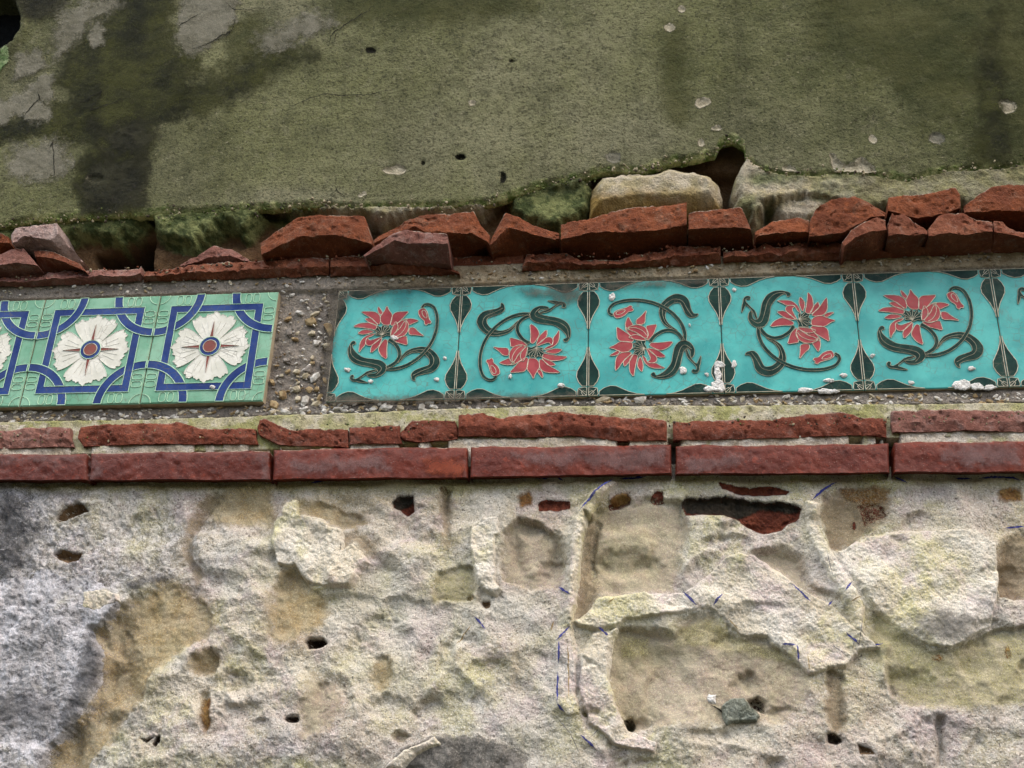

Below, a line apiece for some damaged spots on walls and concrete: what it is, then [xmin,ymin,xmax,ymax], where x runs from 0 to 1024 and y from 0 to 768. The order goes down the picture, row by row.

peeling [5,138,74,184]
water stain [74,115,160,215]
spalling [383,164,406,175]
spalling [829,153,877,173]
water stain [0,495,40,583]
peeling [538,481,1024,753]
water stain [0,632,103,728]